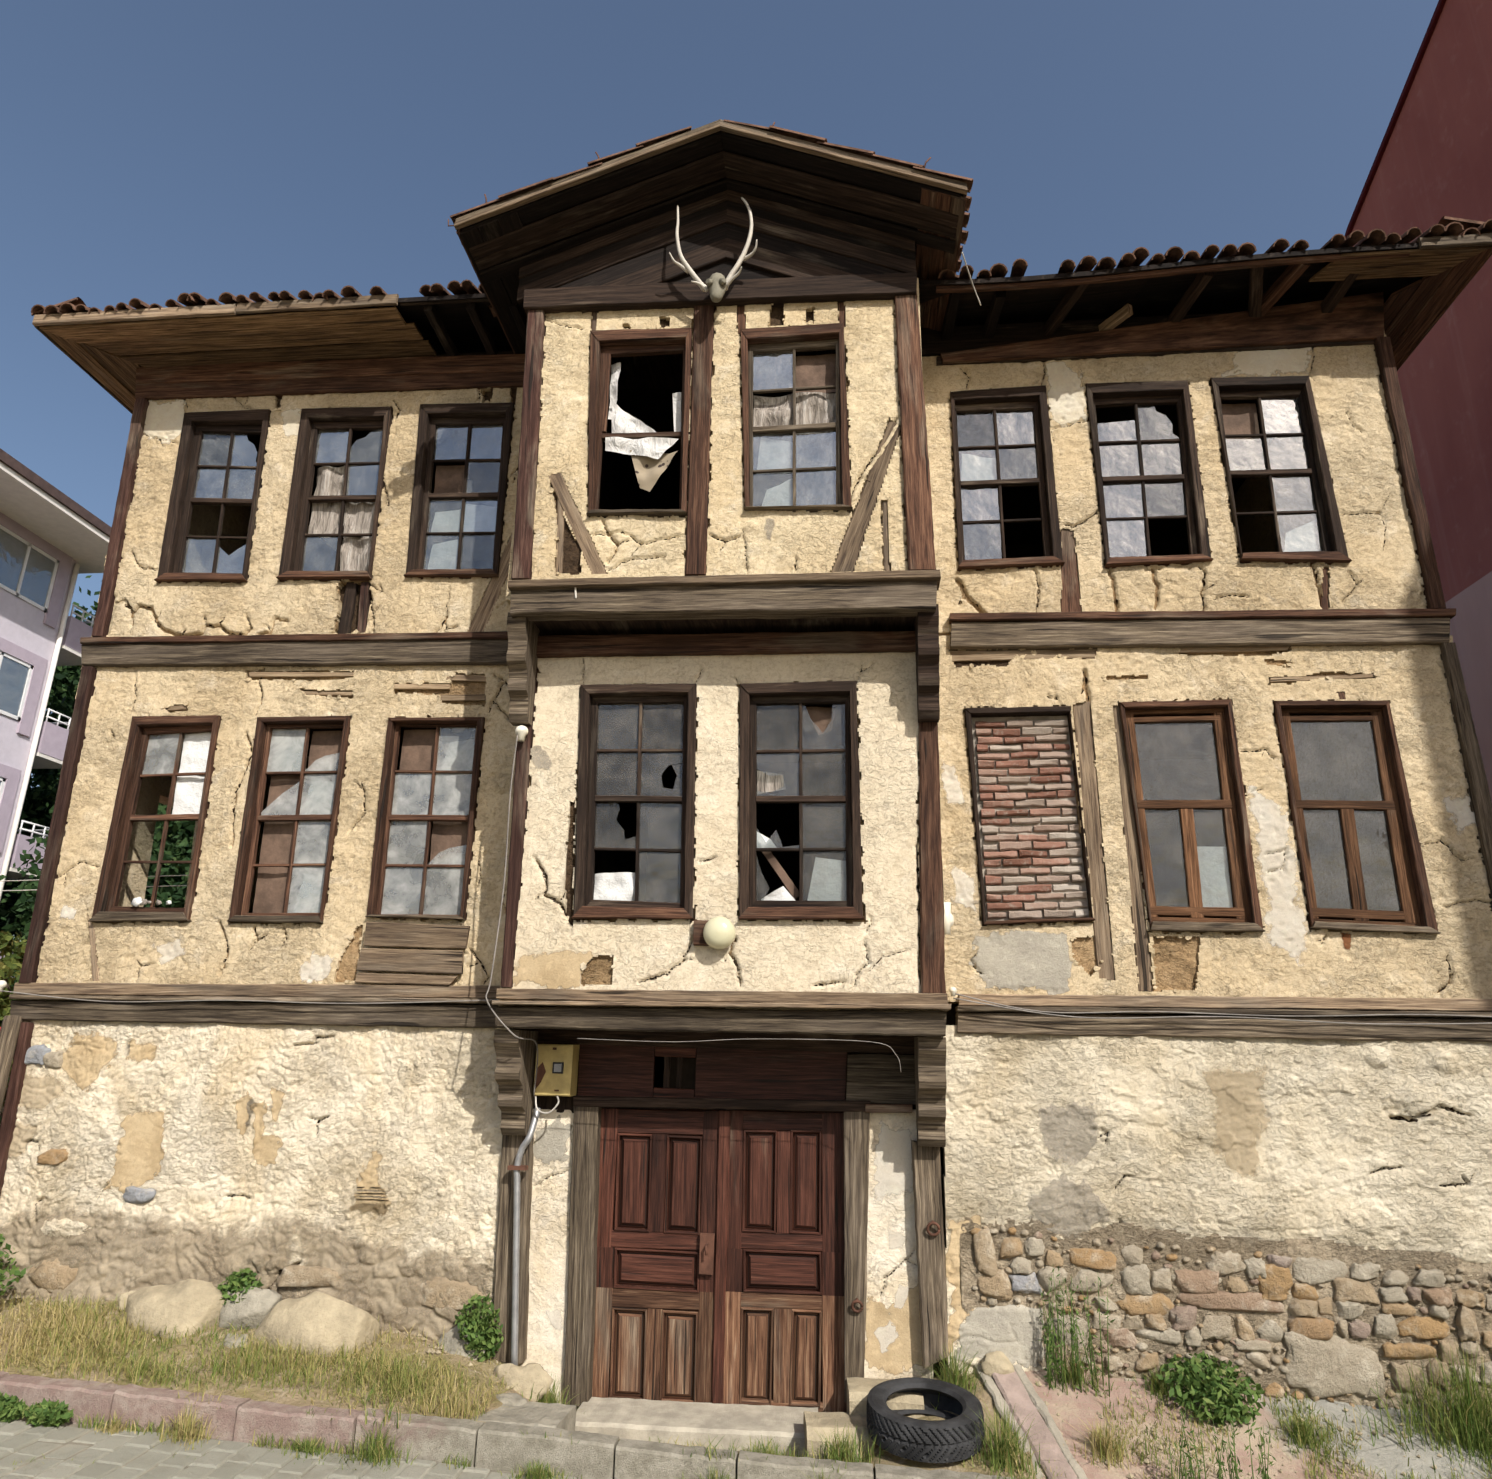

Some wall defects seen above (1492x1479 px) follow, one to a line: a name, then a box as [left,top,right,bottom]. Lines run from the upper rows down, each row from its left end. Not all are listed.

crack [597,521,748,571]
peeling [513,950,614,989]
crack [639,938,741,987]
flaking render [1152,931,1203,992]
peeling [8,1031,157,1165]
peeling [104,1111,165,1204]
peeling [235,1088,285,1167]
peeling [1203,1069,1269,1175]